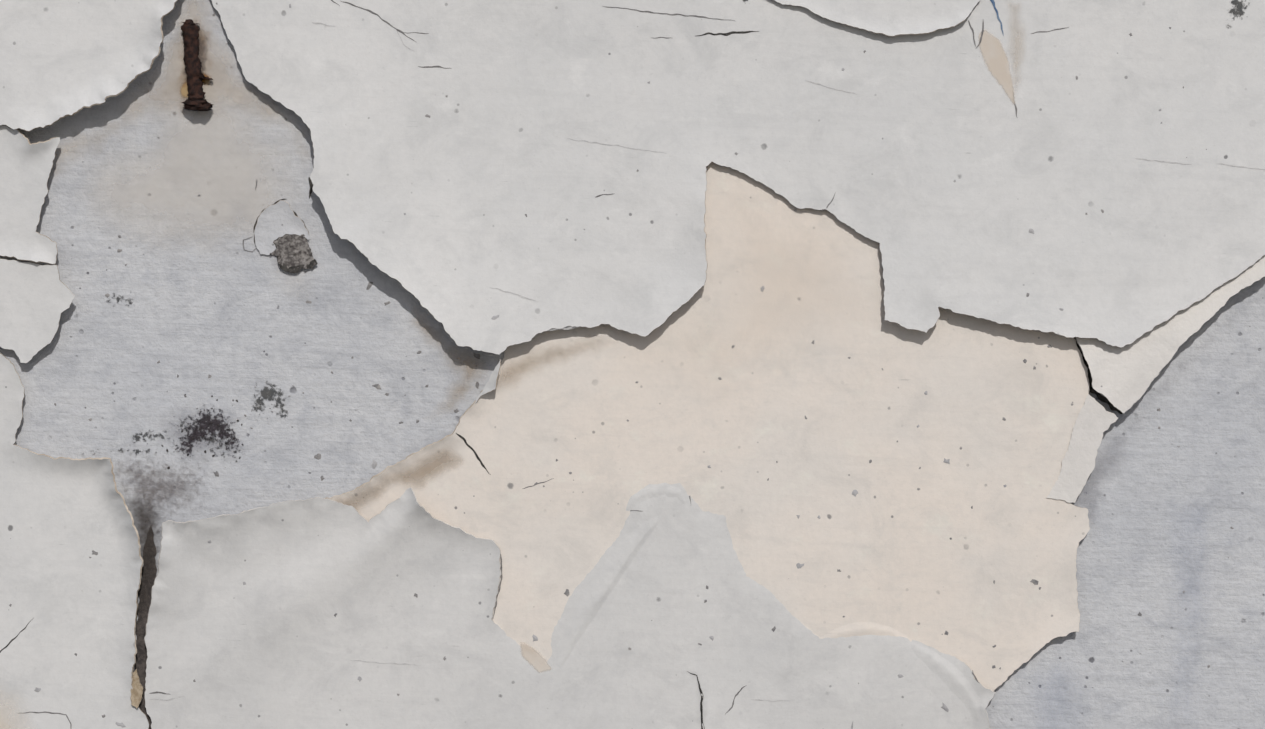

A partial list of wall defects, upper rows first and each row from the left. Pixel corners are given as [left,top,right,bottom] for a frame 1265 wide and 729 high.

peeling [212,0,1265,355]
leakage [118,381,304,462]
peeling [144,162,1265,729]
crack [1074,337,1122,414]
crack [134,526,157,729]
crack [687,671,747,729]